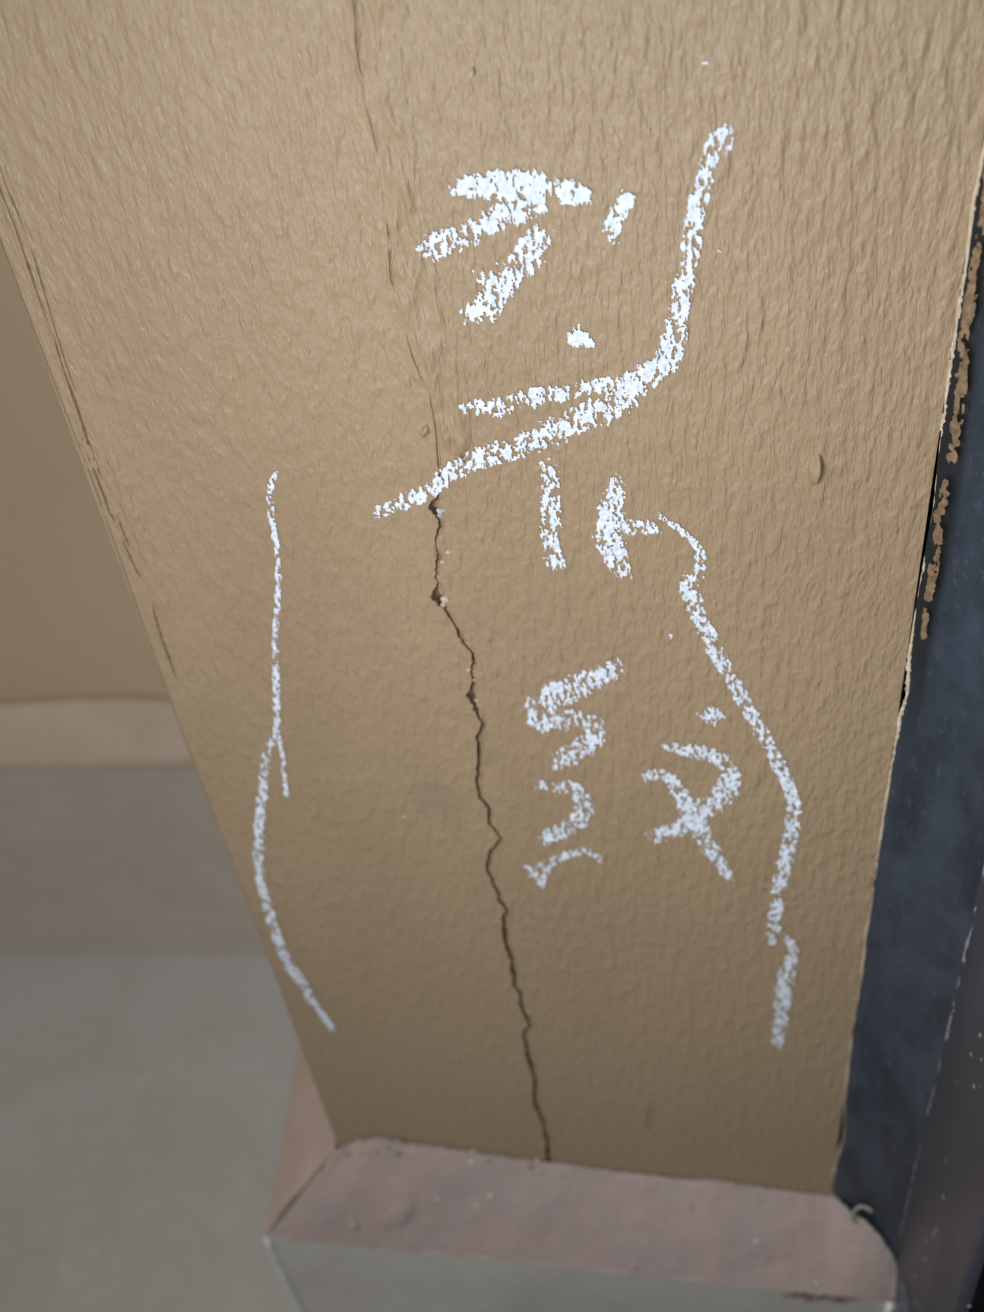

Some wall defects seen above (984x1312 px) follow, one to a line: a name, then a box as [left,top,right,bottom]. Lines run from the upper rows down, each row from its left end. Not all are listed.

crack [351,0,395,292]
crack [406,334,555,1163]